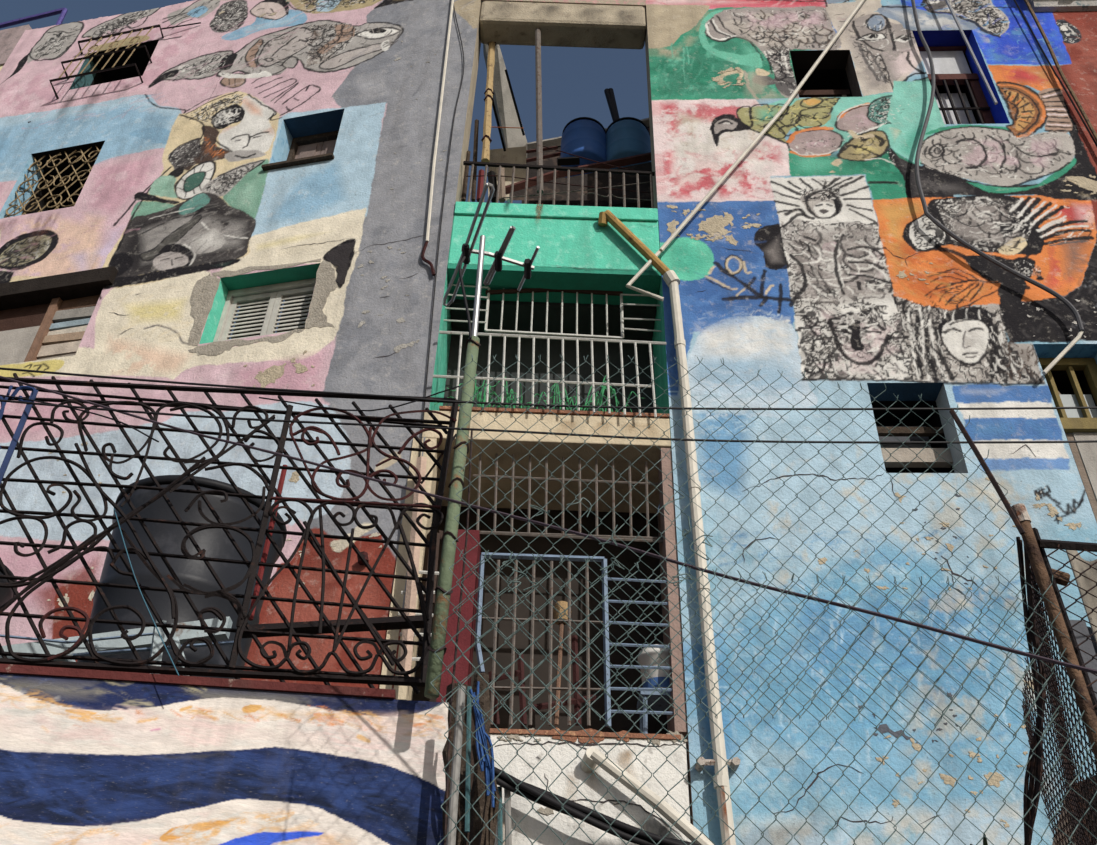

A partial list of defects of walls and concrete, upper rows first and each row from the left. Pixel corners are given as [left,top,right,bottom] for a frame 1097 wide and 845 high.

peeling [1060,175,1097,195]
flaking render [188,241,374,356]
flaking render [858,692,958,751]
crack [774,764,864,814]
flaking render [918,737,1005,795]
crack [829,816,893,830]